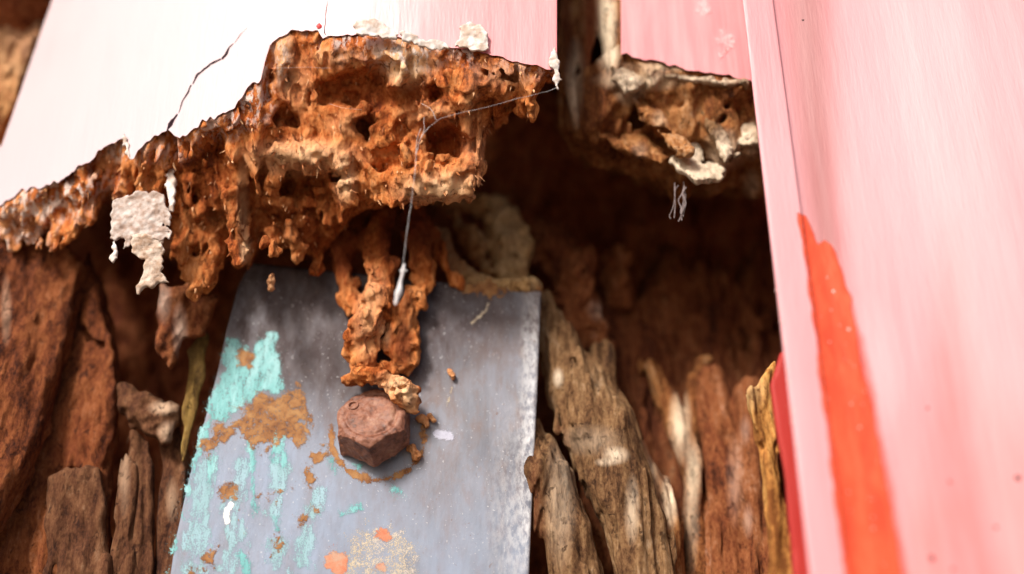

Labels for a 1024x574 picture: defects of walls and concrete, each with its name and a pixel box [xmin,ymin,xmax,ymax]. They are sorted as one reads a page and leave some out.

peeling [353,18,489,52]
crack [166,27,248,131]
peeling [548,48,562,90]
peeling [122,134,131,160]
peeling [109,169,177,295]
rust [229,340,256,373]
peeling [166,331,364,574]
rust [195,381,428,528]
rust [178,544,220,574]